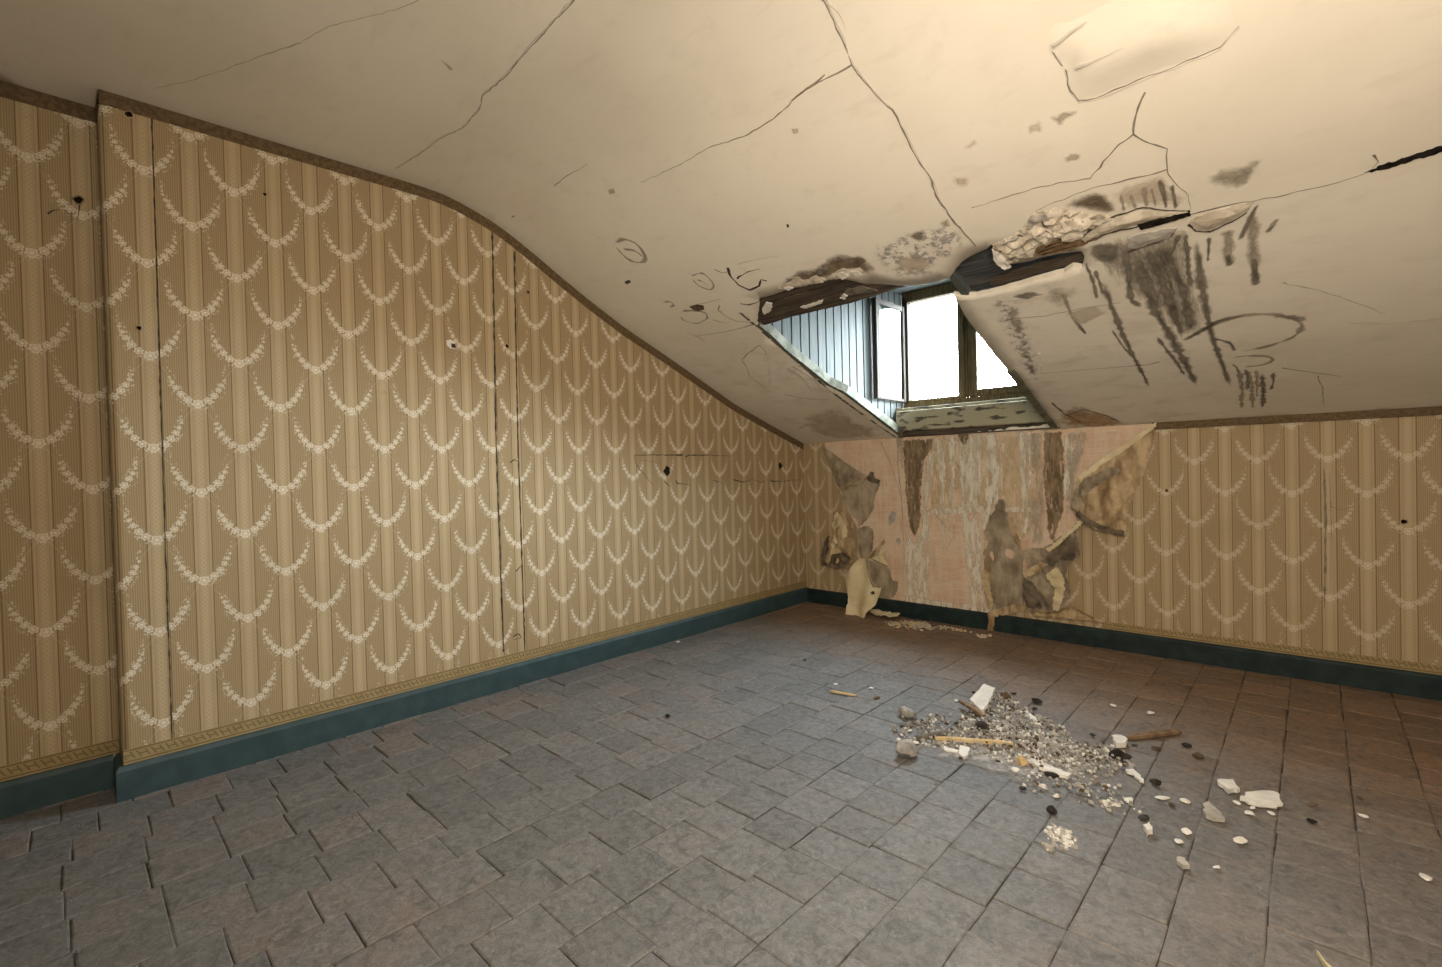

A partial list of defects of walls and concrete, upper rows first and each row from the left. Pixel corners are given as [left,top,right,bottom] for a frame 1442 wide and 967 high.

crack [154,0,418,89]
crack [395,0,575,169]
crack [692,256,877,441]
spalling [762,268,865,314]
leakage [997,293,1037,372]
crack [643,0,1442,246]
flaking render [992,202,1255,270]
leakage [1074,180,1178,211]
leakage [1054,206,1305,407]
flaking render [825,424,1152,613]